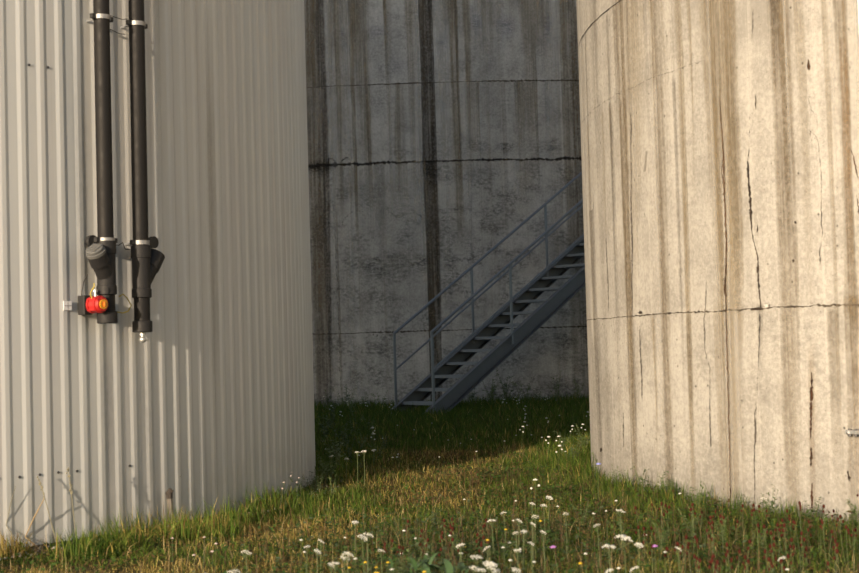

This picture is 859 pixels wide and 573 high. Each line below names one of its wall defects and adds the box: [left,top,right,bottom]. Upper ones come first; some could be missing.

damp [306,0,364,399]
damp [409,0,471,372]
damp [560,0,584,238]
damp [616,3,634,413]
damp [653,131,669,396]
crack [703,100,731,492]
damp [709,0,739,317]
crack [746,94,761,366]
damp [770,0,792,235]
damp [835,0,849,136]
damp [845,148,857,390]
crack [751,404,759,499]